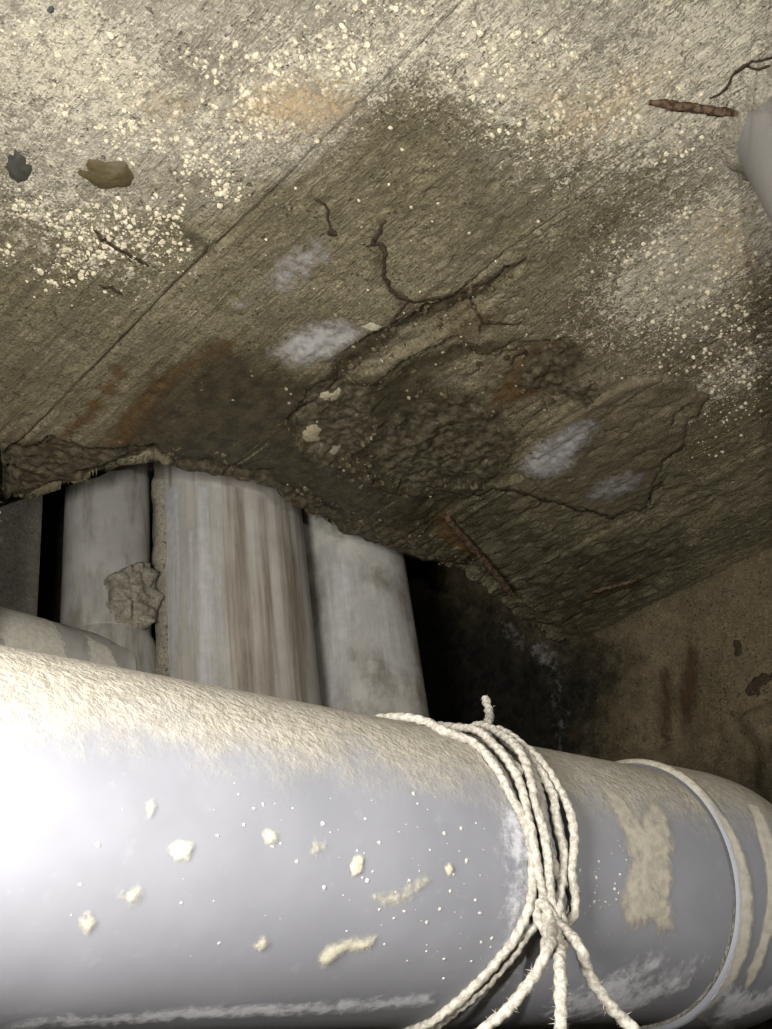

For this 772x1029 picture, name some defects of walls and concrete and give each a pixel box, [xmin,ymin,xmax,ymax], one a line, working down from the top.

damp [0,0,427,297]
damp [435,21,681,151]
corrosion [648,99,737,117]
crack [709,56,772,99]
crack [314,198,337,237]
spalling [2,437,482,571]
damp [121,273,500,537]
crack [366,219,526,334]
crack [510,349,532,365]
crack [422,444,685,519]
damp [520,421,596,478]
damp [603,190,772,438]